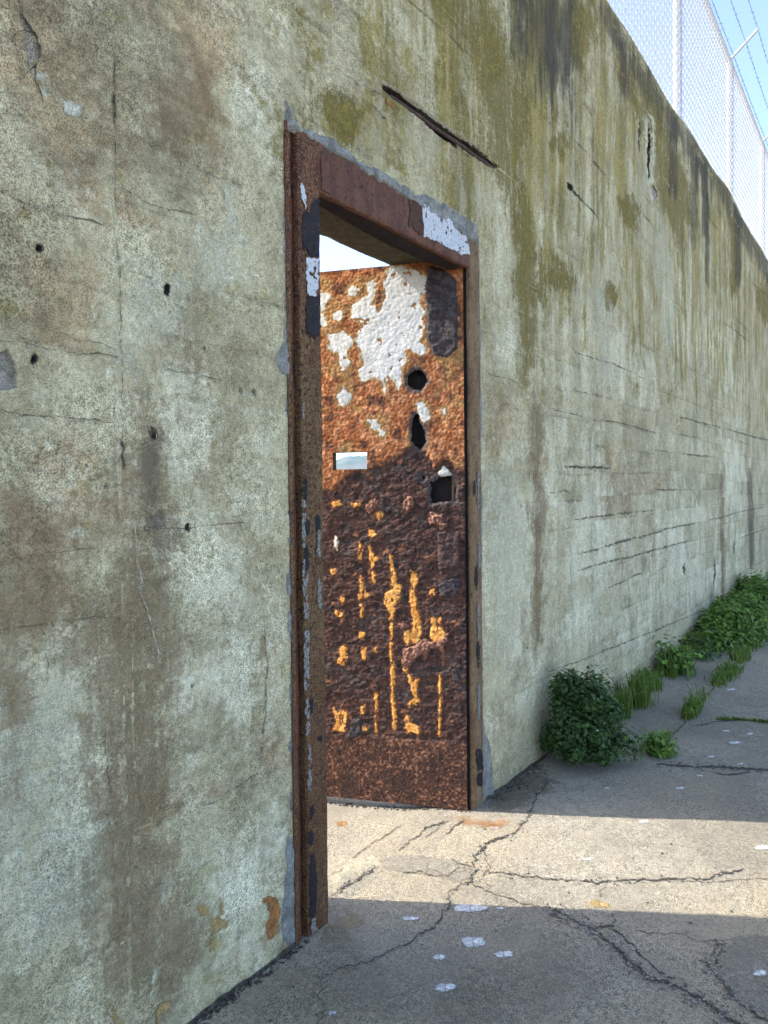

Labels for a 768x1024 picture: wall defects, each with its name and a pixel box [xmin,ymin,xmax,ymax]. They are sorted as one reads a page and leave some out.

crack [9,10,43,96]
leakage [511,0,582,113]
leakage [599,6,768,286]
spalling [0,337,46,402]
corrosion [263,896,281,939]